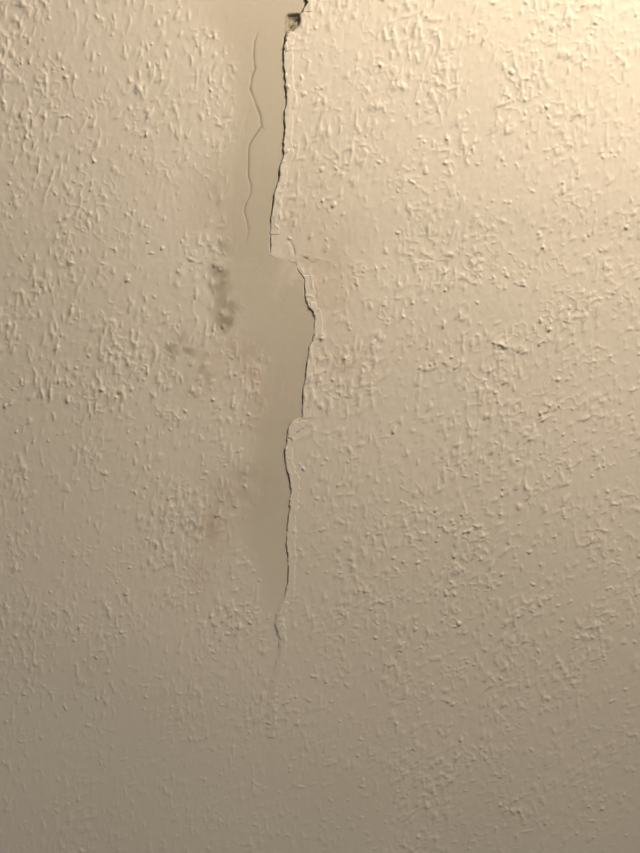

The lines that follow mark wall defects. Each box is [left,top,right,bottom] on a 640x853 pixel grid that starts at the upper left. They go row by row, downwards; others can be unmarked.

crack [244,0,308,249]
peeling [261,0,316,256]
crack [291,243,314,405]
crack [283,424,291,595]
peeling [266,275,324,738]